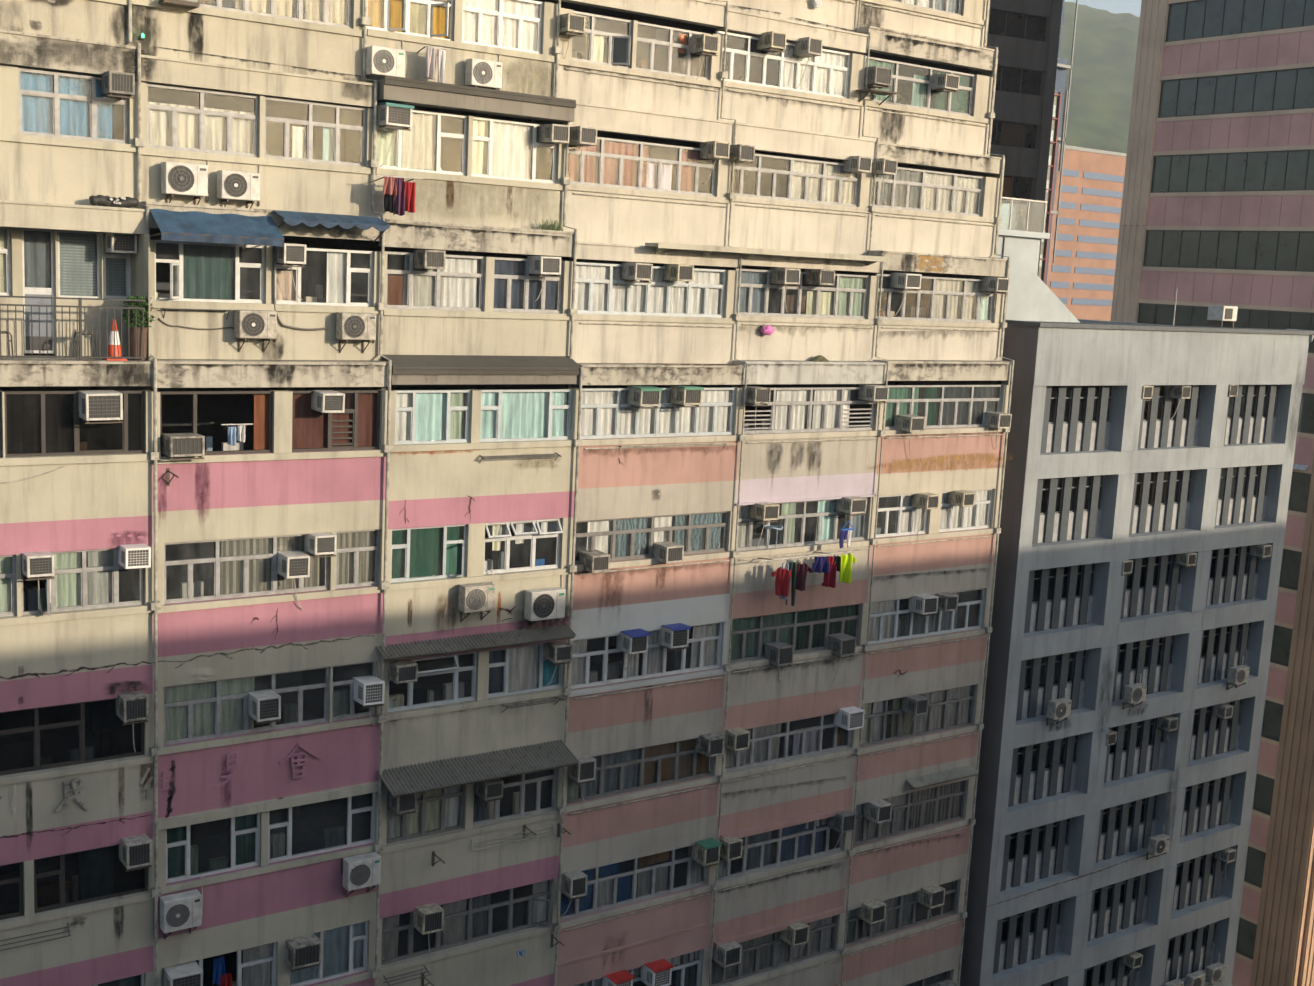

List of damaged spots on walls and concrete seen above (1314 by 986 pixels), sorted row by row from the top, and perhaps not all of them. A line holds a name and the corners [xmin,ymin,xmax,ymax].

water stain [113,4,270,76]
water stain [196,466,207,500]
rust [890,454,1001,470]
crack [0,609,370,679]
crack [0,760,175,838]